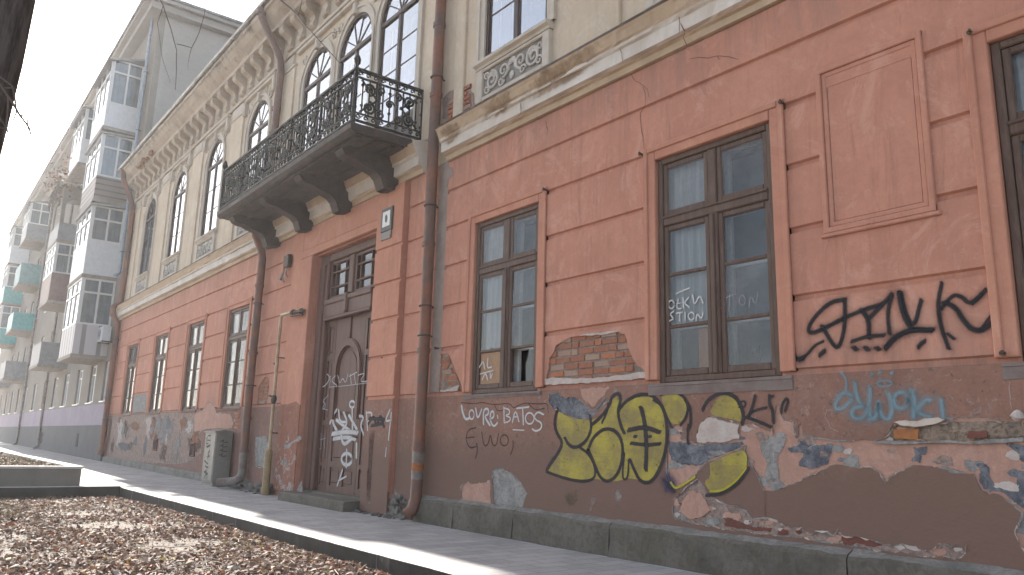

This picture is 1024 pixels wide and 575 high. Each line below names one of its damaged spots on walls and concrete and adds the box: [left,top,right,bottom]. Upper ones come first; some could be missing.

crack [679,17,736,59]
flaking render [439,353,462,392]
flaking render [545,330,645,419]
peeling [107,393,241,464]
flaking render [460,468,528,507]
peeling [666,405,1024,560]